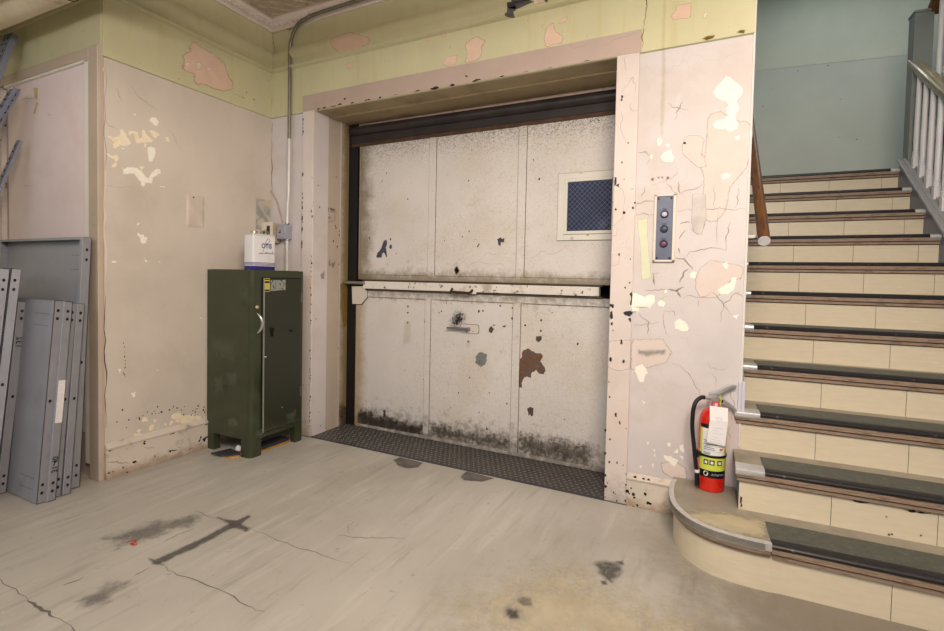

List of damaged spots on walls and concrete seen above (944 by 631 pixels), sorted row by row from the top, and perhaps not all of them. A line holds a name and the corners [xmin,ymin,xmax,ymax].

peeling [178,43,254,100]
peeling [713,76,743,140]
peeling [106,117,169,187]
crack [570,0,742,337]
leakage [340,283,348,325]
rust [519,336,545,388]
leakage [358,410,423,435]
crack [0,579,75,631]
crack [166,567,264,612]